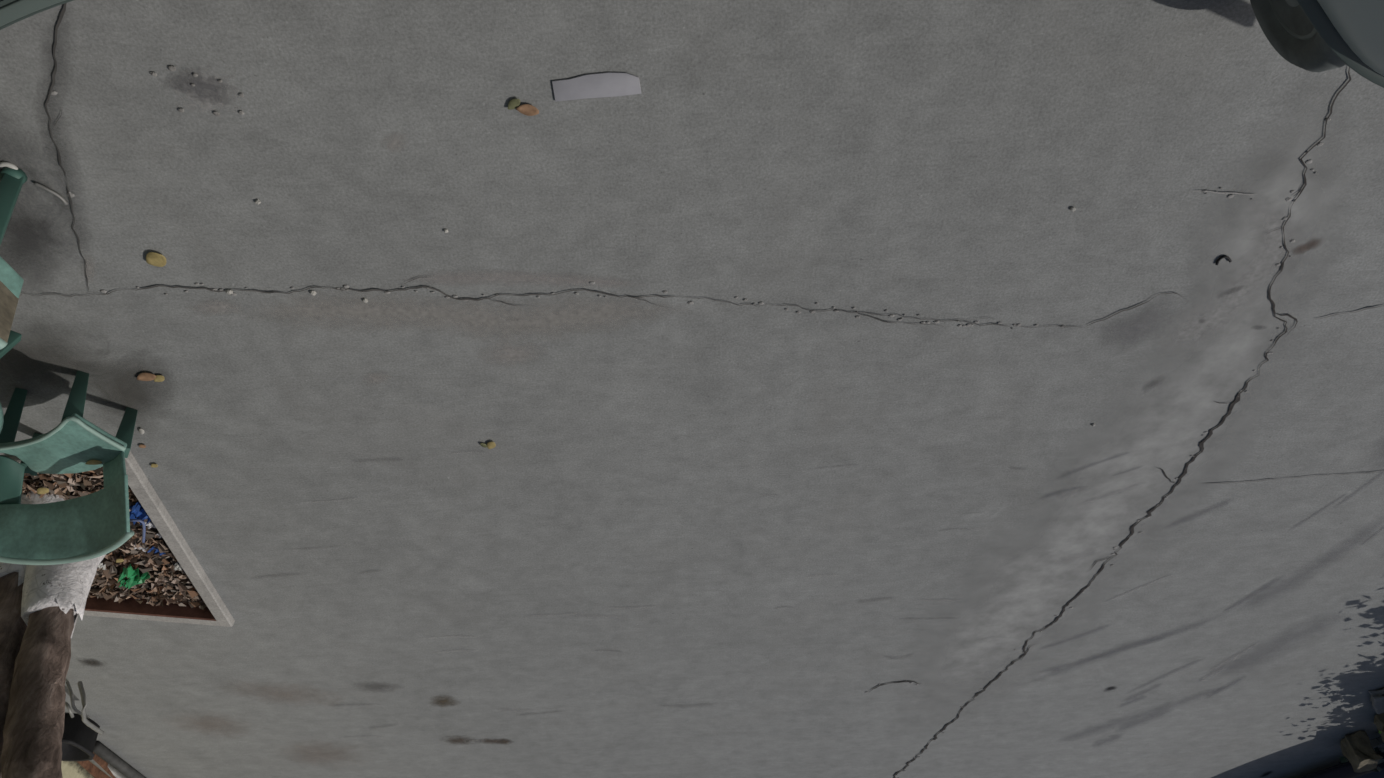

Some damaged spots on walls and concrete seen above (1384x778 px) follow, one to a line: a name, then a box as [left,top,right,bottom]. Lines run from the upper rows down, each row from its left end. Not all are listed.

crack [21,3,1184,329]
crack [894,67,1384,778]
crack [865,680,921,693]